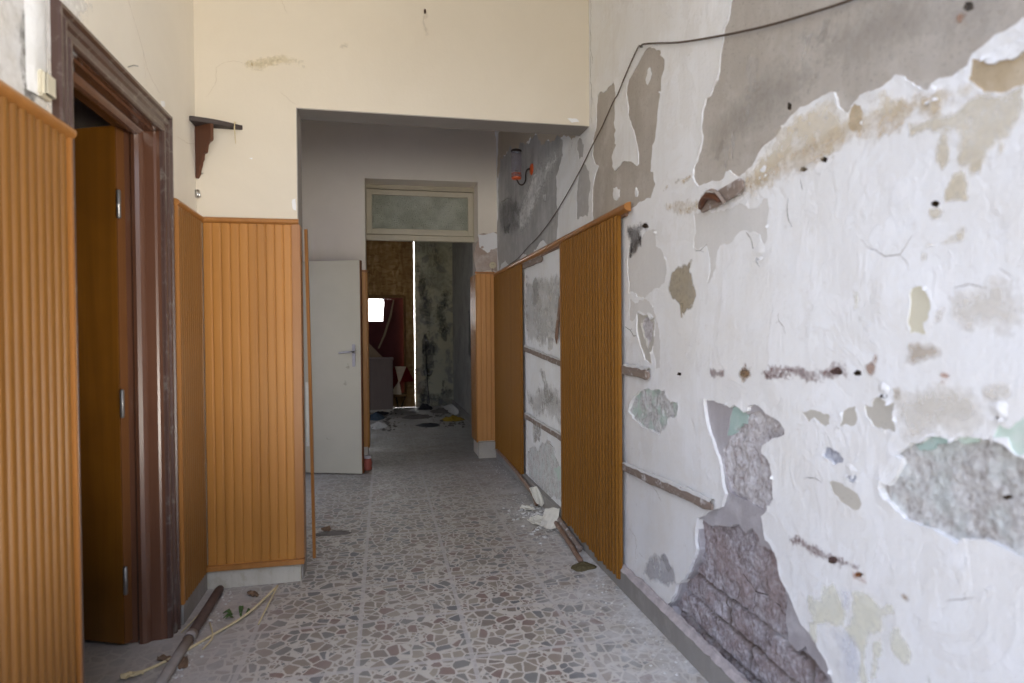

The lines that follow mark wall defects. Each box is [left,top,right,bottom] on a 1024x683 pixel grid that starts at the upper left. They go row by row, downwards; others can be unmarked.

water stain [503,152,559,229]
peeling [474,47,665,272]
peeling [694,0,1024,185]
water stain [420,288,448,376]
peeling [628,229,667,369]
peeling [905,286,930,334]
spalling [628,389,678,433]
spalling [670,400,832,683]
spalling [878,418,1024,556]